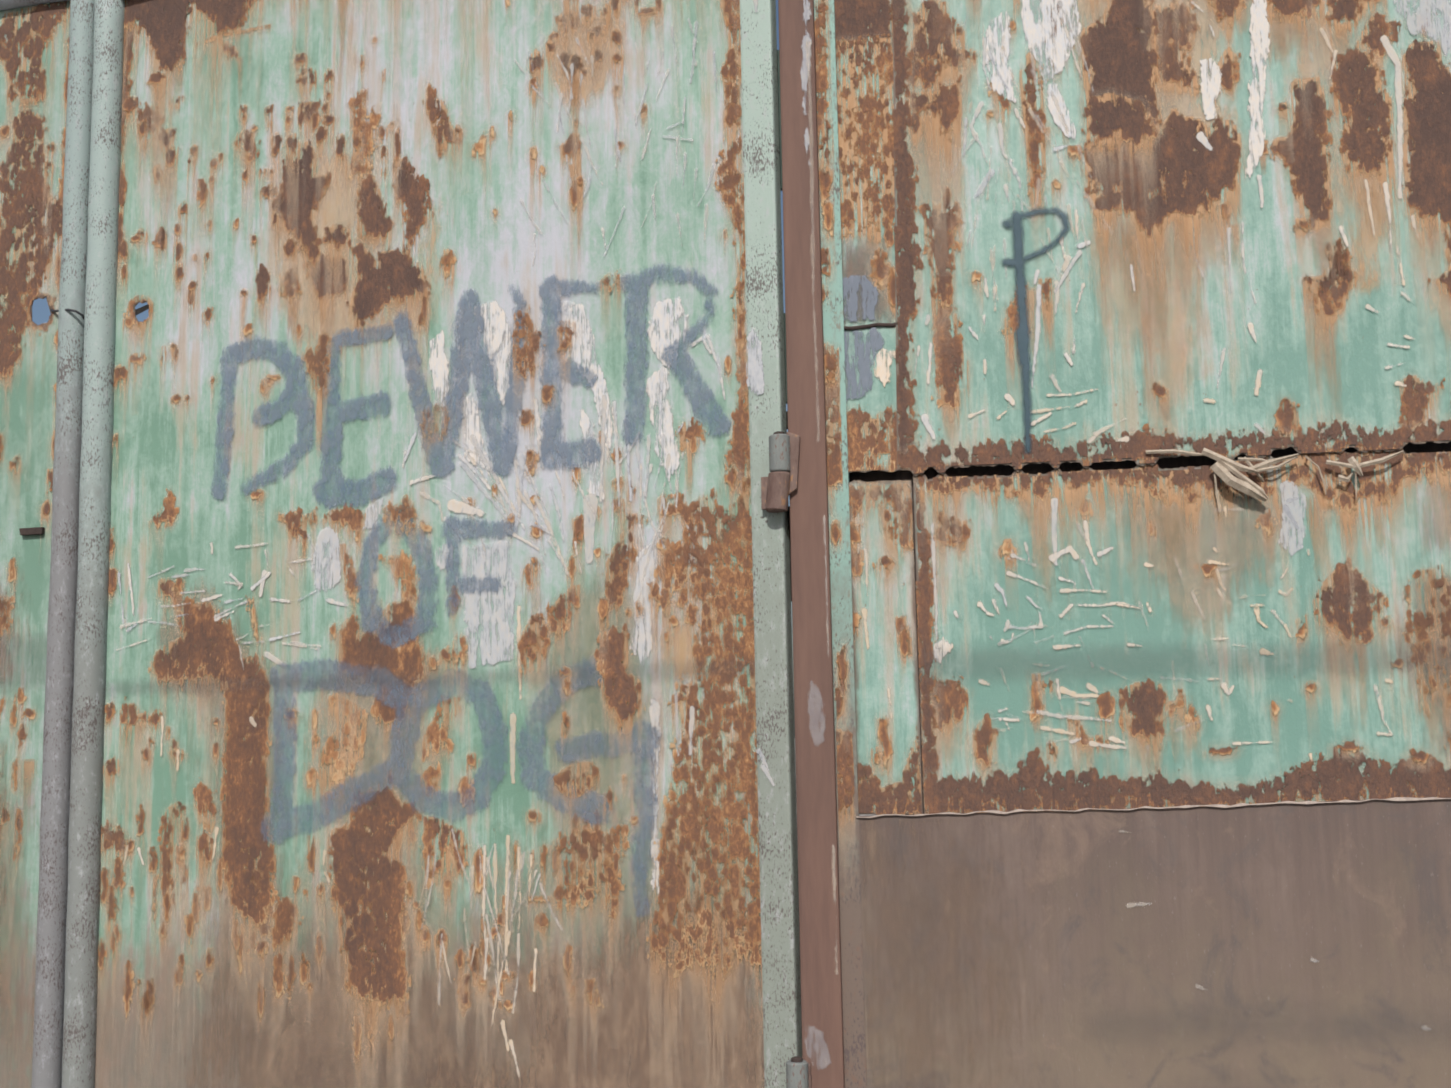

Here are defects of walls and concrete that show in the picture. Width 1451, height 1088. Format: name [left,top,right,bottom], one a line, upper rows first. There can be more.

peeling [985,11,1016,103]
peeling [1047,84,1076,138]
peeling [1200,58,1222,120]
rust [0,0,70,381]
rust [0,435,20,475]
rust [41,430,55,521]
rust [98,0,764,1088]
rust [0,557,36,861]